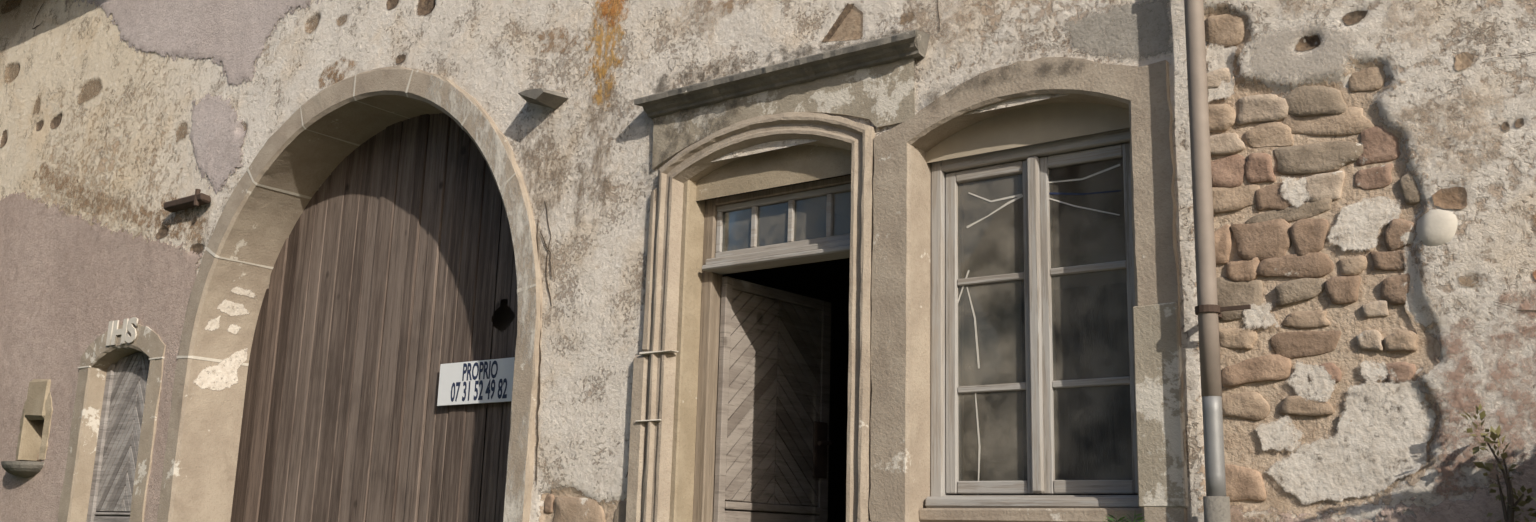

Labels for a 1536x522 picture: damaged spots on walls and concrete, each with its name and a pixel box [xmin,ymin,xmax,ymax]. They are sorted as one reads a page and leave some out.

spalling [4,62,20,84]
spalling [33,96,62,131]
peeling [75,0,348,194]
peeling [318,58,355,88]
spalling [386,0,435,16]
peeling [537,28,576,53]
corrosion [585,0,627,107]
peeling [428,75,560,357]
flaking render [1203,0,1536,522]
peeling [0,166,209,522]
peeling [194,286,256,391]
flaking render [503,419,627,522]